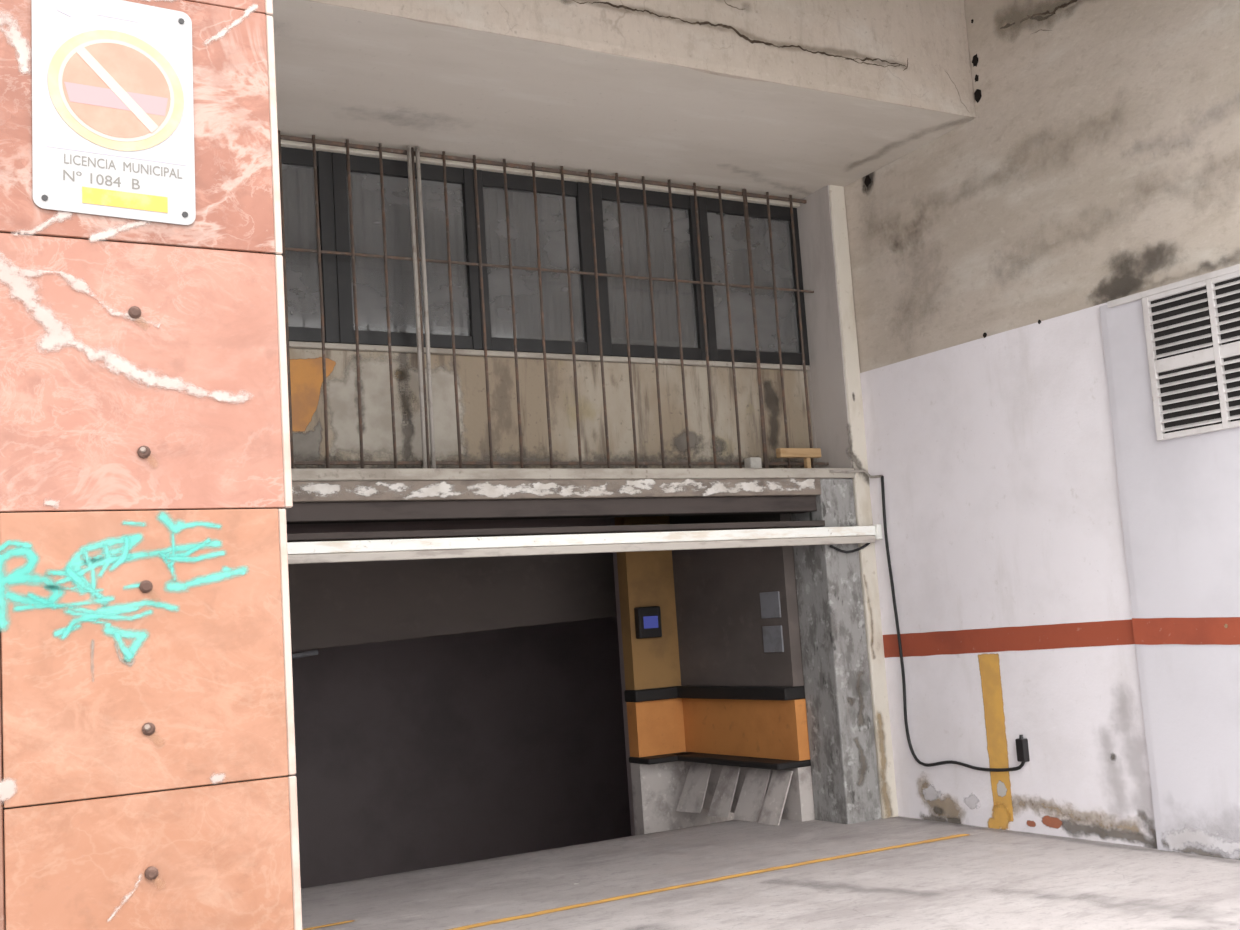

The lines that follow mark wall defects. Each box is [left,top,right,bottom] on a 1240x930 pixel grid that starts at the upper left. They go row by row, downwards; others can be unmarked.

crack [996,0,1081,34]
crack [573,0,908,71]
peeling [290,356,466,461]
peeling [292,478,815,500]
spalling [1027,816,1063,829]
peeling [1165,828,1240,854]